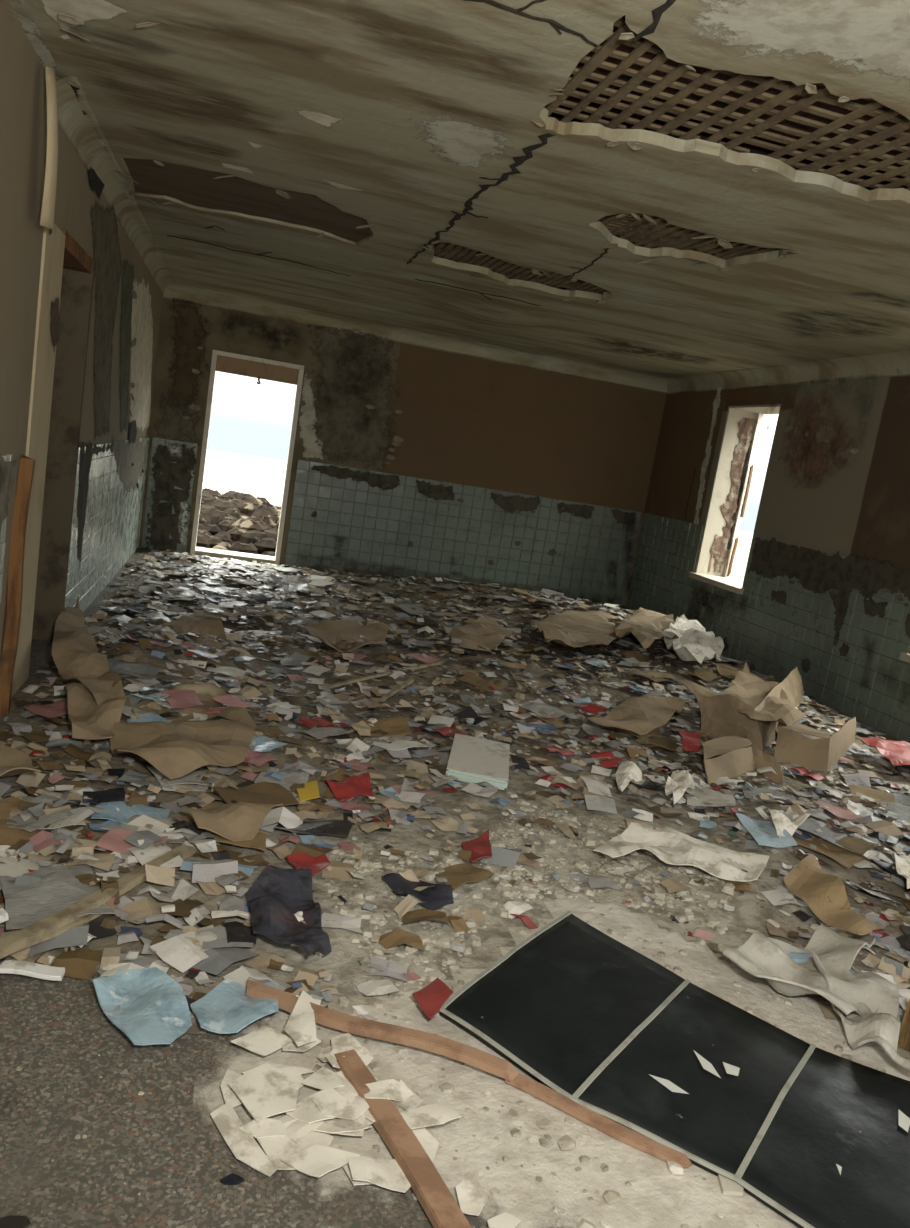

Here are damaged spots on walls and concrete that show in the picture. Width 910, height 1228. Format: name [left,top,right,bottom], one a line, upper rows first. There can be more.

peeling [41,0,127,42]
crack [464,0,598,47]
crack [632,0,676,42]
peeling [690,0,910,81]
spalling [531,18,910,191]
peeling [414,114,509,171]
crack [407,133,555,306]
spalling [421,243,614,305]
crack [563,248,609,279]
spalling [599,212,798,272]
spalling [77,110,375,567]
peeling [416,480,464,503]